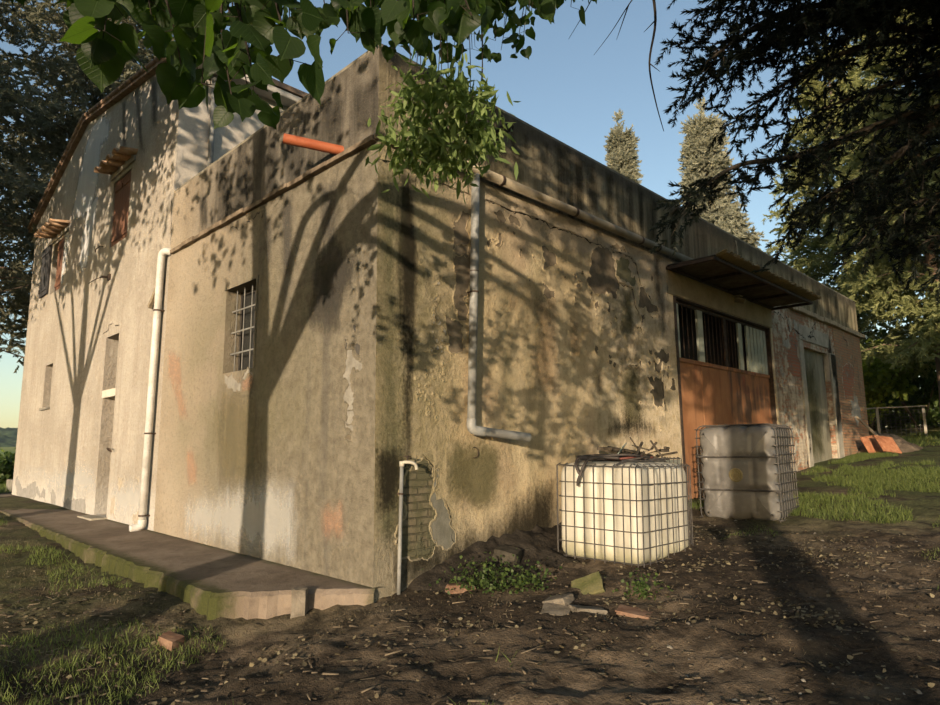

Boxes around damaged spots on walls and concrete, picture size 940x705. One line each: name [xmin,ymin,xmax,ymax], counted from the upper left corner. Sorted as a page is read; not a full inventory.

flaking render [486,209,521,250]
crack [380,153,668,332]
flaking render [518,241,660,335]
flaking render [342,323,364,433]
water stain [379,175,417,530]
flaking render [594,344,676,410]
flaking render [394,457,457,562]